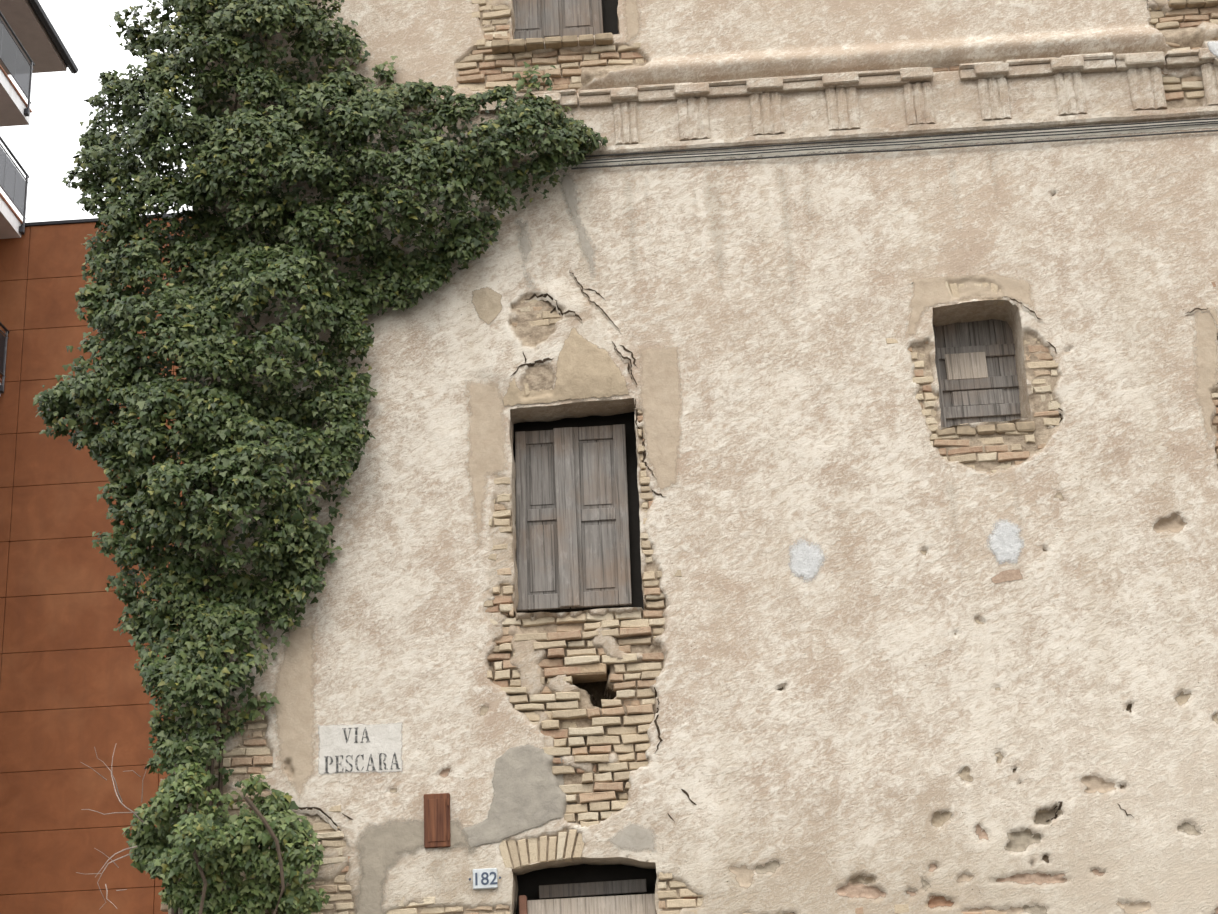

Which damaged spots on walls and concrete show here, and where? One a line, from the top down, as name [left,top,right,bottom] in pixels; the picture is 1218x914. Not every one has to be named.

flaking render [455,0,646,98]
crack [510,353,552,377]
crack [525,271,664,497]
flaking render [886,338,1061,473]
flaking render [483,408,682,869]
flaking render [187,695,292,818]
flaking render [1081,775,1124,794]
flaking render [277,805,355,914]
flaking render [386,897,510,914]
flaking render [657,872,703,914]
flaking render [835,864,1047,914]
flaking render [996,809,1072,885]